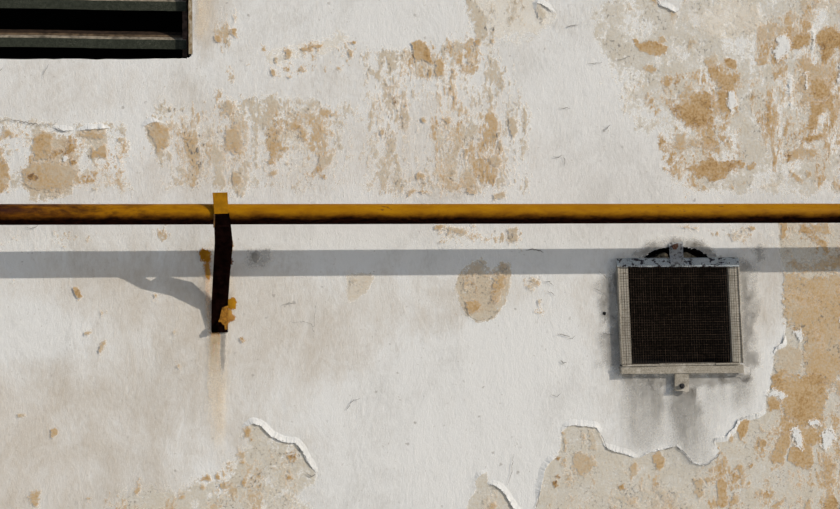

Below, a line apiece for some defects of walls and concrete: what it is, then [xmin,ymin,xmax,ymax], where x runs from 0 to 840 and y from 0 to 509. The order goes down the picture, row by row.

peeling [0,0,557,202]
peeling [591,0,840,204]
peeling [434,224,522,251]
peeling [455,258,511,323]
water stain [634,238,716,258]
water stain [598,244,765,438]
peeling [535,223,840,509]
peeling [28,489,42,508]
peeling [105,417,318,509]